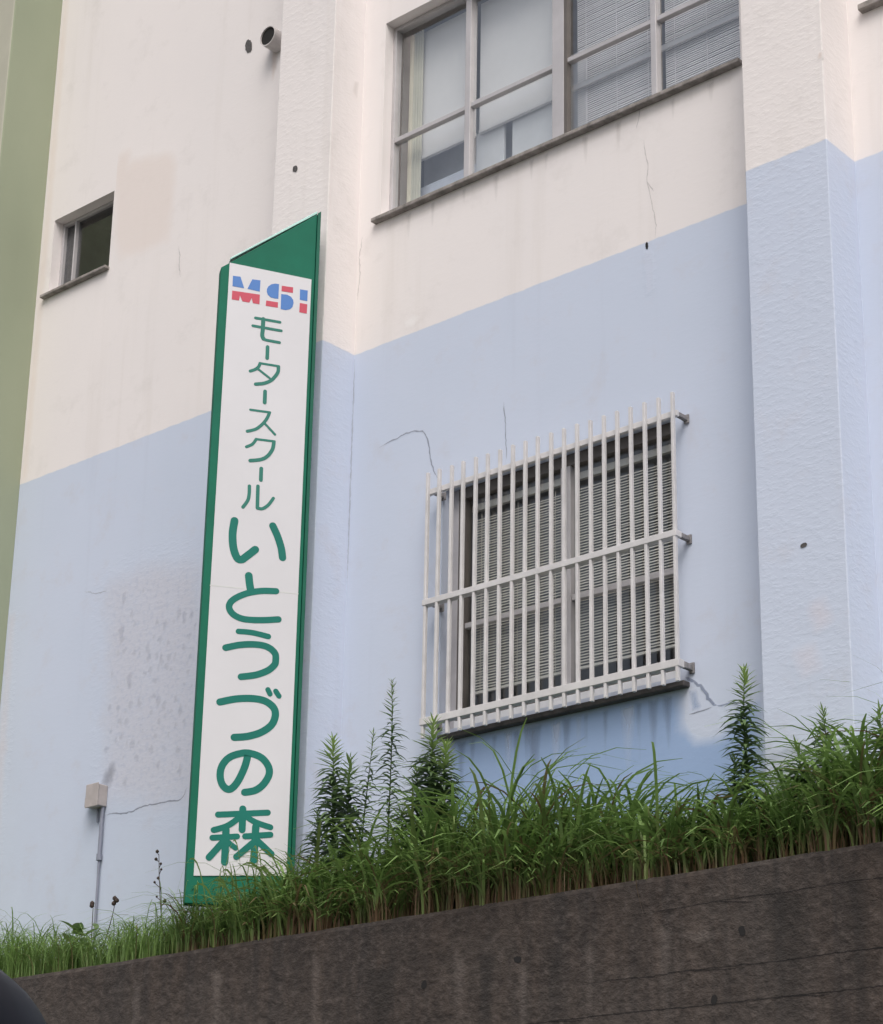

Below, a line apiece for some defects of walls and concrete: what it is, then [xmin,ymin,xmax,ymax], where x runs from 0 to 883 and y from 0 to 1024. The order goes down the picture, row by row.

water stain [442,674,766,843]
crack [687,678,738,706]